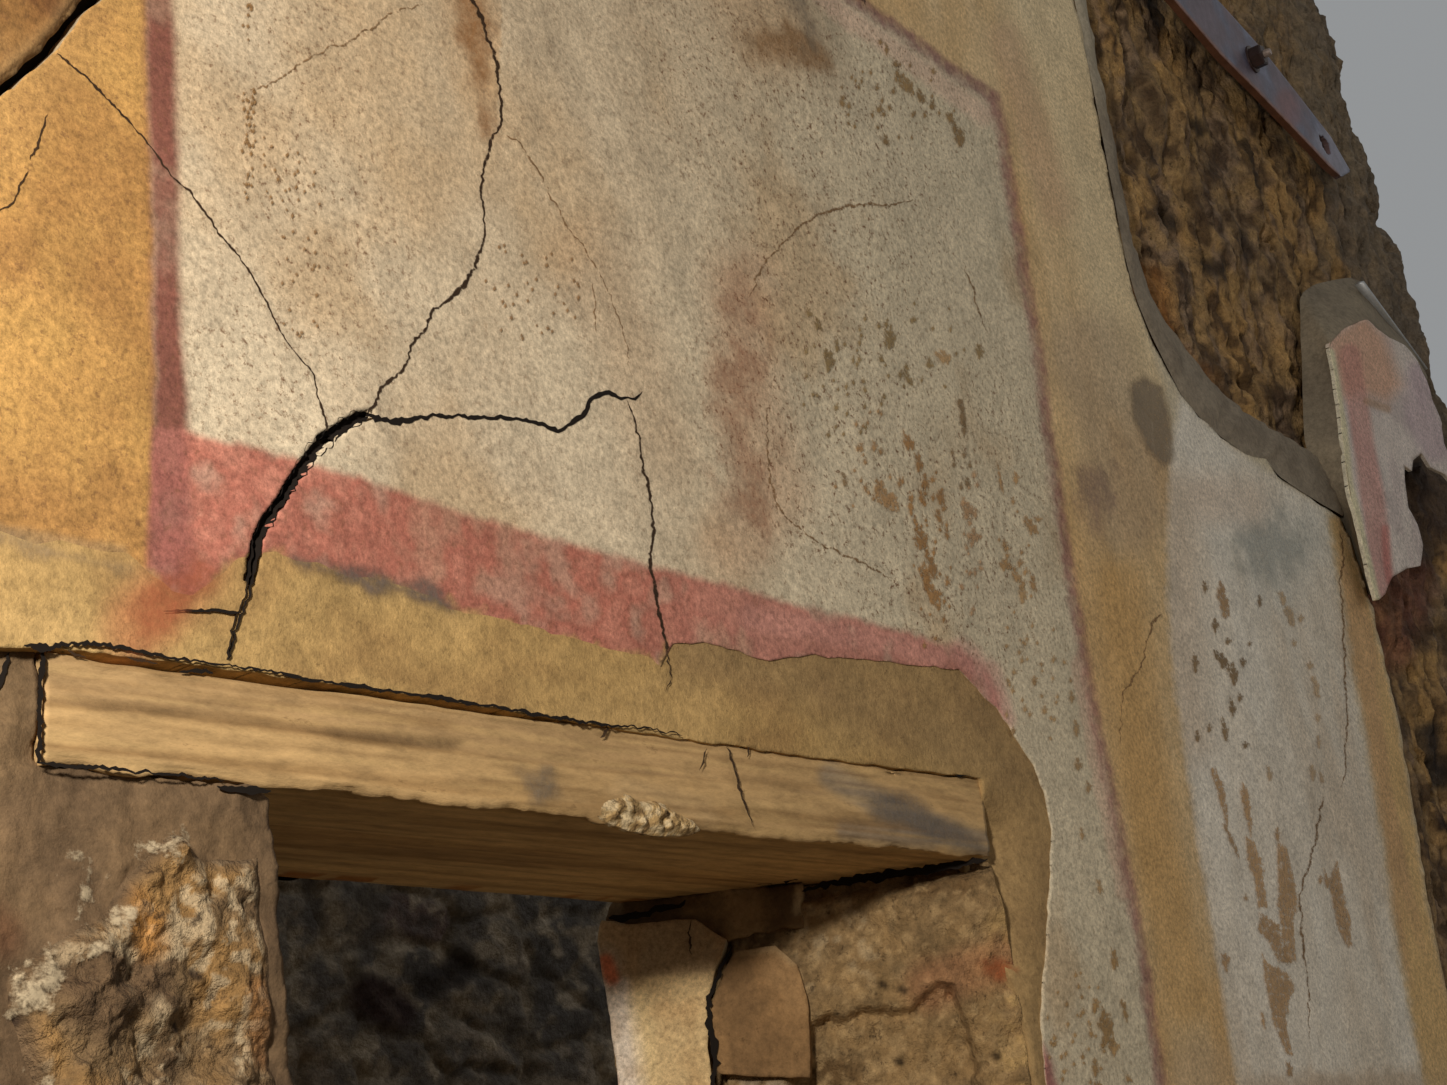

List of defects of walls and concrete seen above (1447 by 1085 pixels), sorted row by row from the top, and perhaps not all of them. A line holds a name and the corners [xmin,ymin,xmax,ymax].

peeling [839,40,966,146]
flaking render [1073,0,1447,516]
crack [0,0,753,825]
peeling [802,306,1081,740]
peeling [1195,580,1251,749]
peeling [1258,591,1304,646]
crack [609,900,732,1085]
peeling [1047,971,1128,1085]
peeling [1211,768,1300,1077]
peeling [1319,861,1352,947]